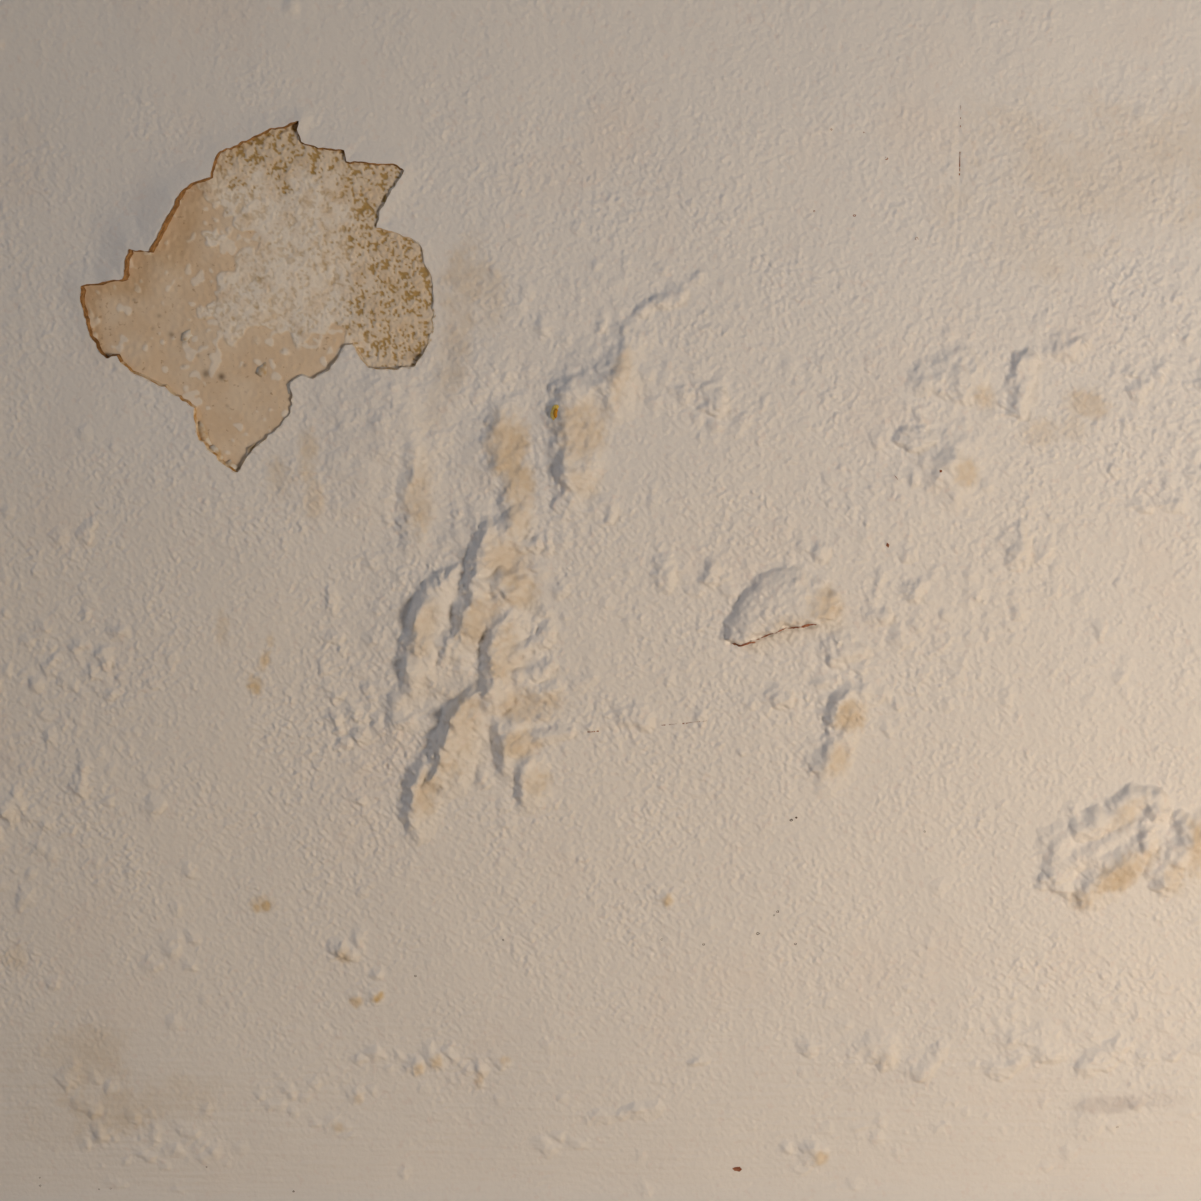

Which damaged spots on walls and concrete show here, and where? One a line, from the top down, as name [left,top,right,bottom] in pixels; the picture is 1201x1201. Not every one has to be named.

peeling [57,105,436,473]